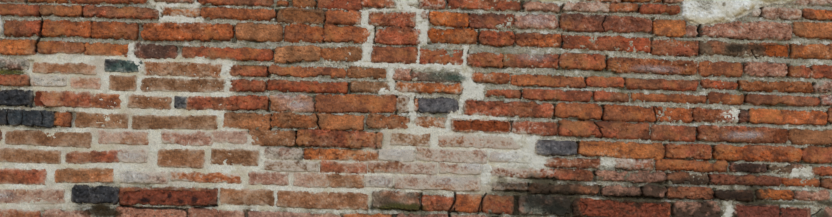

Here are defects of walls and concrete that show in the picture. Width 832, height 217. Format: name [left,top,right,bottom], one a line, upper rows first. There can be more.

peeling [681,0,797,29]